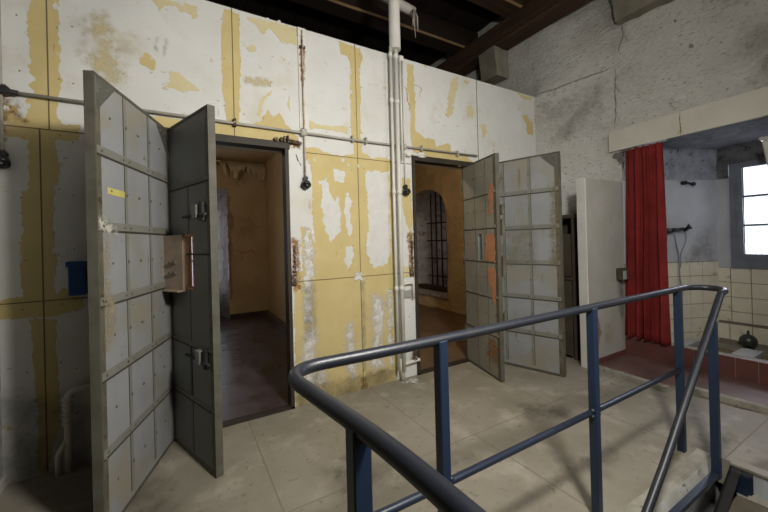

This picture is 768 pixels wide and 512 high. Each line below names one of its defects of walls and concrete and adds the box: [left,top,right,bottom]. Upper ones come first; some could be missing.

peeling [152,0,200,19]
peeling [139,53,156,70]
peeling [161,71,200,94]
peeling [215,9,298,148]
crack [537,25,628,126]
peeling [151,116,181,128]
peeling [293,41,414,366]
spalling [226,192,234,300]
peeling [303,355,397,397]
peeling [295,391,310,407]